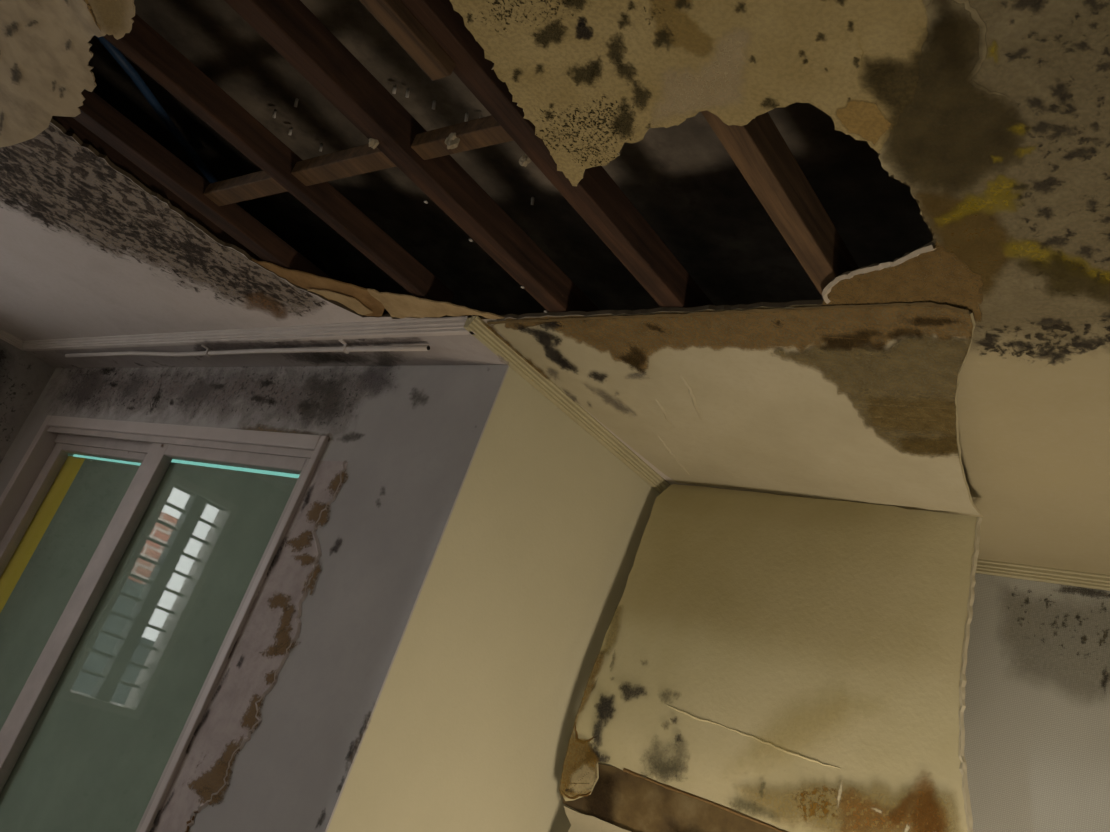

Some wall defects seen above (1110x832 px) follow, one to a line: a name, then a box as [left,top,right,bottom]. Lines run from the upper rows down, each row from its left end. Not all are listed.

leakage [0,123,325,317]
leakage [450,0,1110,457]
leakage [65,338,420,440]
flaking render [150,461,348,832]
leakage [1012,587,1110,687]
spalling [336,712,370,792]
leakage [560,608,646,822]
leakage [642,717,683,780]
leakage [733,783,928,832]
corrosion [794,780,946,832]